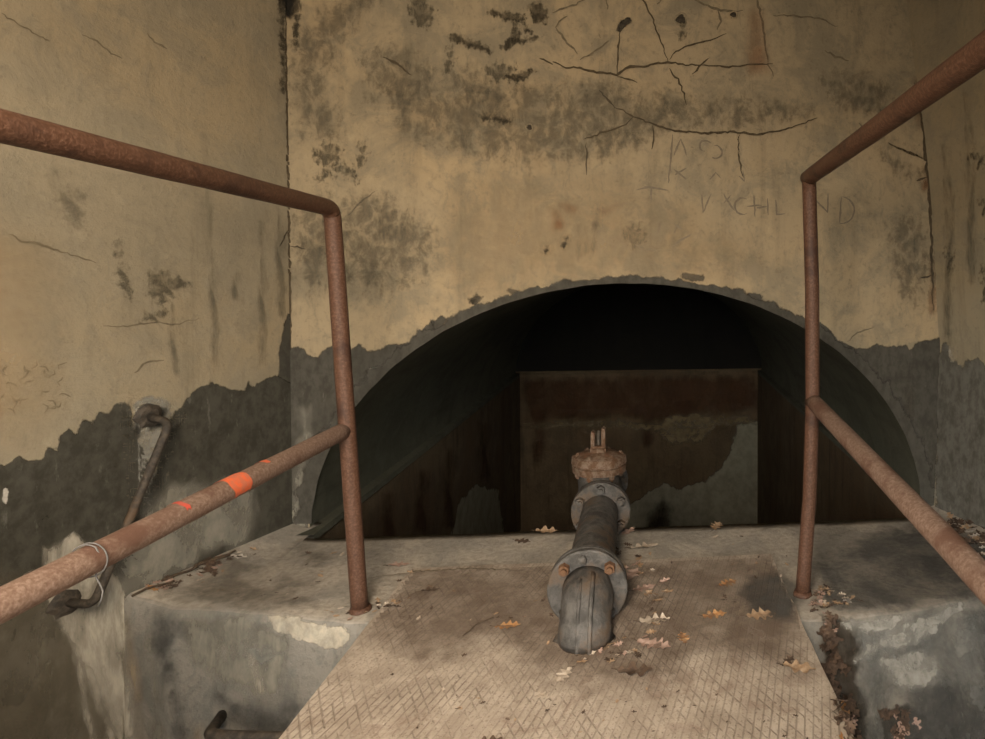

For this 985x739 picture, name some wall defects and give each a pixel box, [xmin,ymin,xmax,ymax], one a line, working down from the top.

damp [278,0,301,67]
damp [445,3,548,72]
damp [486,64,533,83]
crack [540,0,836,176]
damp [314,143,366,179]
damp [145,272,190,321]
peeling [353,273,805,407]
peeling [819,326,935,503]
peeling [116,492,251,592]
peeling [292,447,331,524]
peeling [451,484,504,534]
peeling [625,421,758,528]